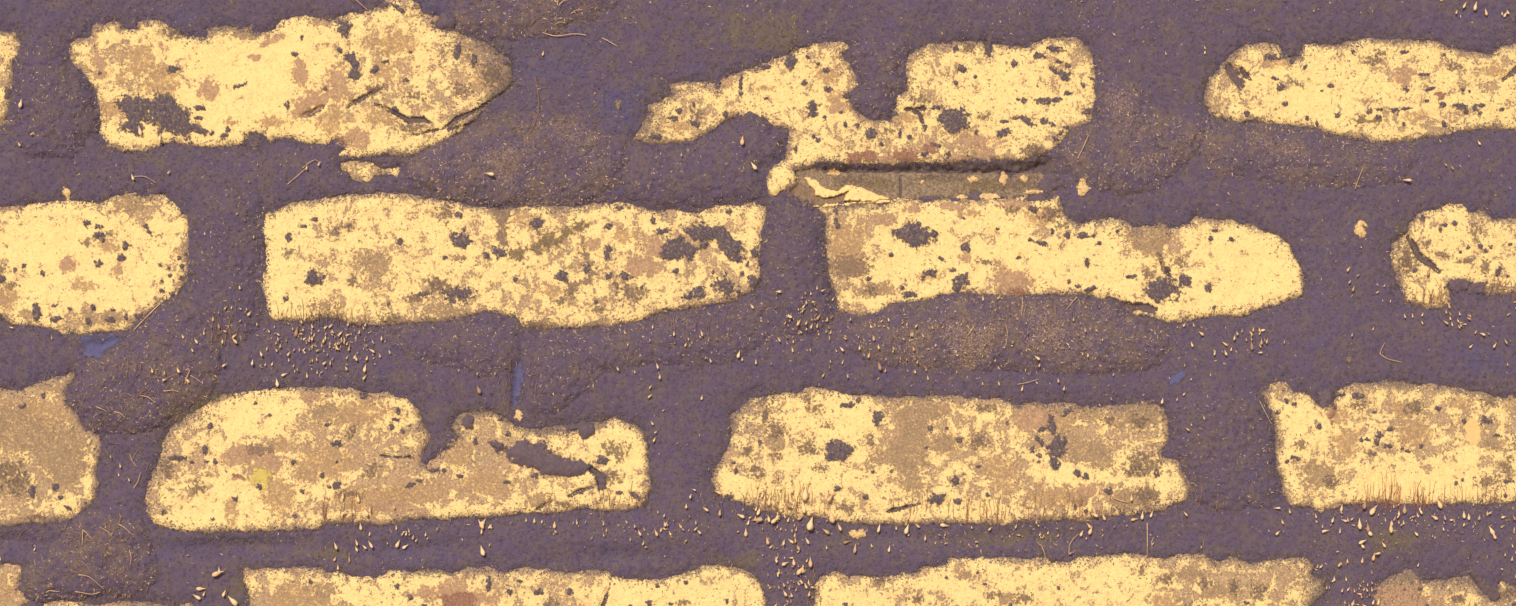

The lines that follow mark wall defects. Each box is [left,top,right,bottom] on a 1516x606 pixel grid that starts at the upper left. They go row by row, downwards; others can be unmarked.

crack [302,81,520,136]